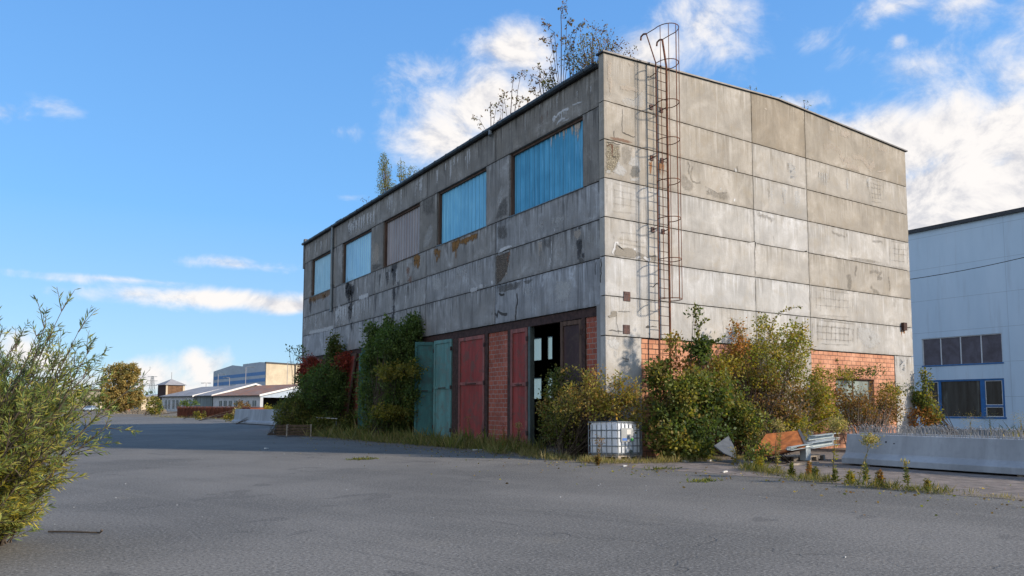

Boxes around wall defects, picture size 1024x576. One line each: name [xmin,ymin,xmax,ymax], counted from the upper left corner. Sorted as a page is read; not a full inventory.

corrosion [434,234,478,262]
damp [310,282,368,334]